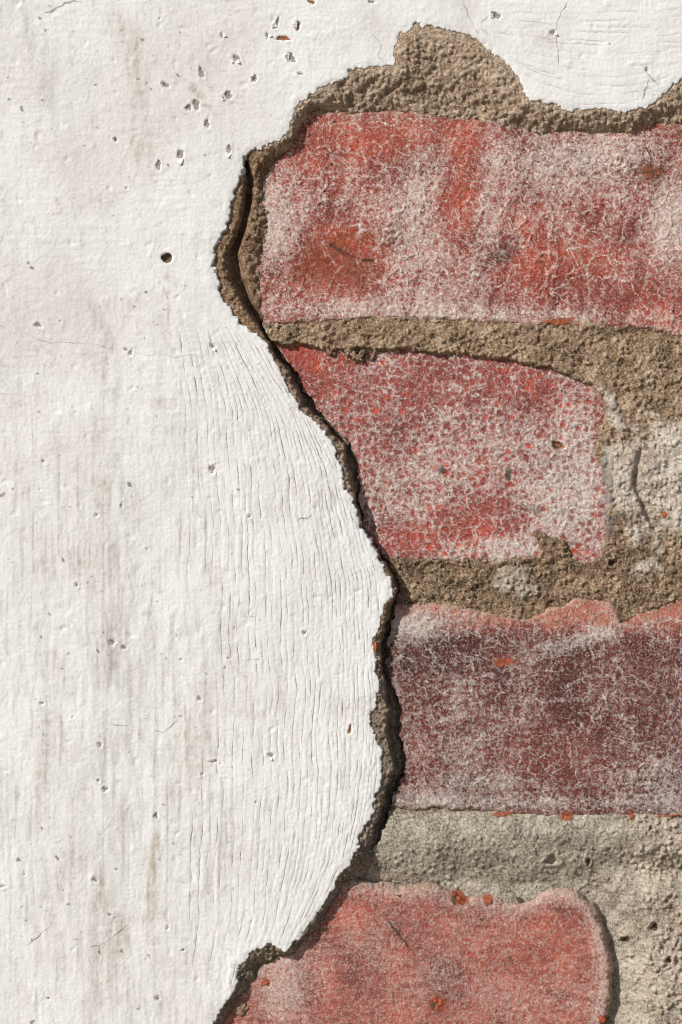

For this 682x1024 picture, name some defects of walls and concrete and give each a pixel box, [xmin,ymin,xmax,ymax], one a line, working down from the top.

spalling [213,17,682,1024]